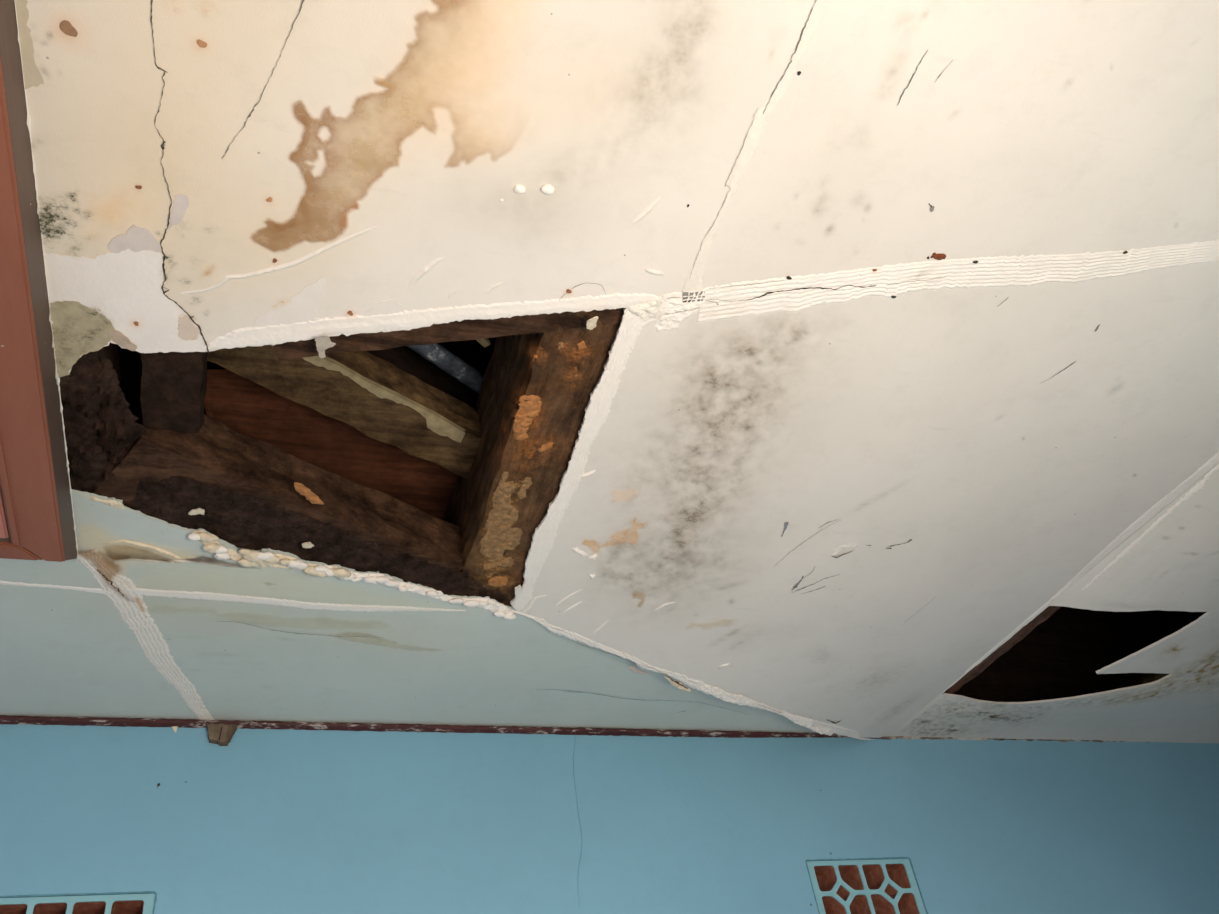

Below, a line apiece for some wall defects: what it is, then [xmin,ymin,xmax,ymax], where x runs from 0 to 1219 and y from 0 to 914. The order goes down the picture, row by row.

water stain [418,0,460,23]
crack [222,0,304,158]
water stain [354,41,420,117]
crack [150,0,209,353]
water stain [253,102,431,251]
crack [661,1,942,321]
peeling [109,328,137,351]
peeling [315,336,336,358]
peeling [586,316,598,330]
flaking render [187,530,522,620]